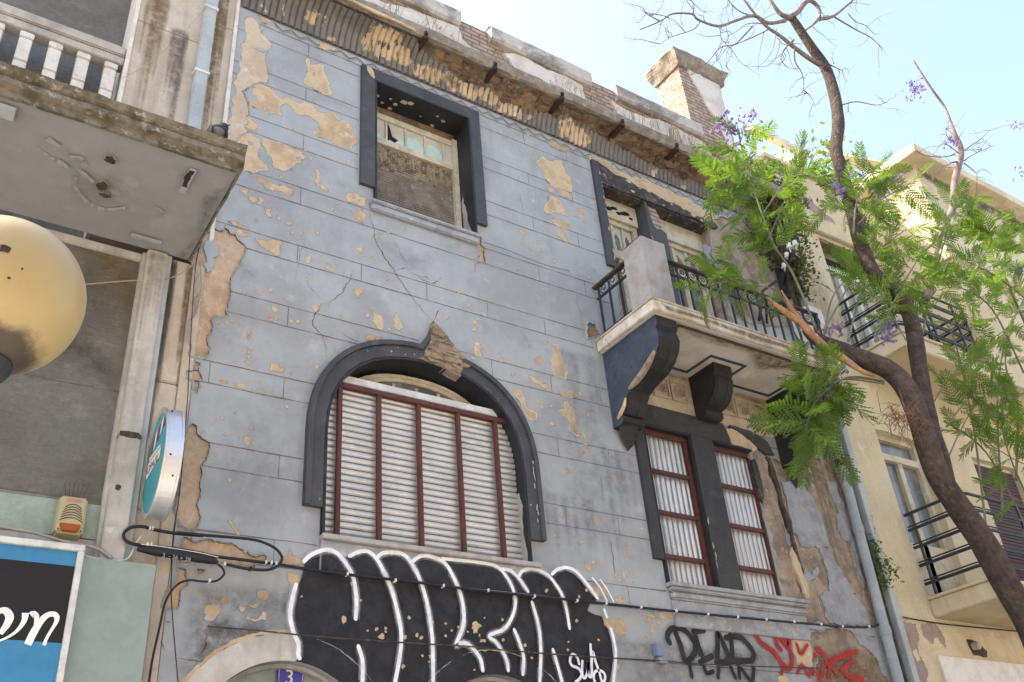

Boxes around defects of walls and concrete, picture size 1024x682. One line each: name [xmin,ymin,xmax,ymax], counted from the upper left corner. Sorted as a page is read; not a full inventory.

peeling [377,94,445,127]
spalling [185,15,360,395]
crack [297,236,355,356]
crack [369,211,441,321]
spalling [391,303,485,381]
peeling [510,340,589,478]
spalling [418,40,793,329]
spalling [160,423,267,611]
spalling [726,425,893,682]
peeling [903,619,946,682]